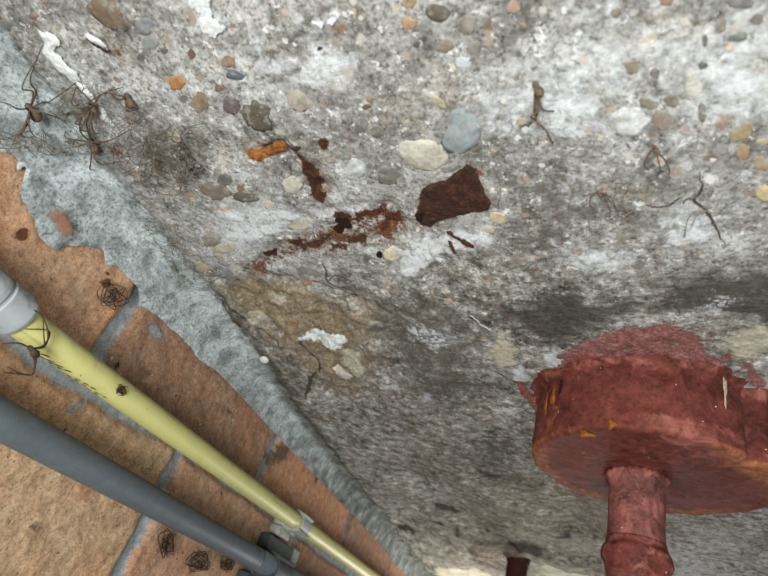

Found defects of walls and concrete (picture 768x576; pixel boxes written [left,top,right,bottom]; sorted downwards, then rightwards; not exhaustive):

spalling [16,228,28,241]
corrosion [288,144,329,203]
corrosion [243,164,492,276]
spalling [217,278,367,400]